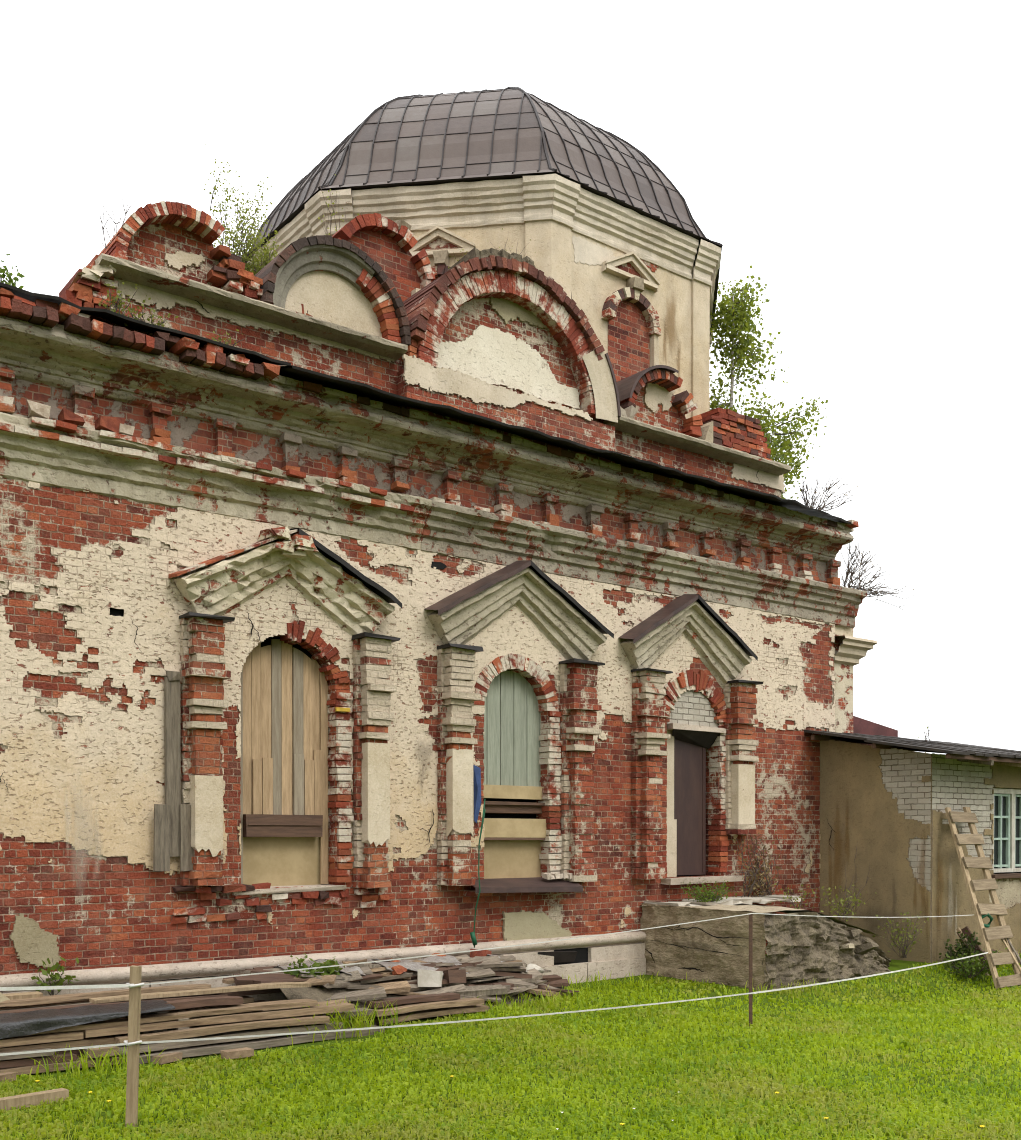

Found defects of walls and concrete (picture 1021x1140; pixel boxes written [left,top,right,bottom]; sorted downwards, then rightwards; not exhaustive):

spalling [0,478,187,739]
spalling [757,614,835,709]
spalling [0,655,828,975]
spalling [879,748,1021,909]